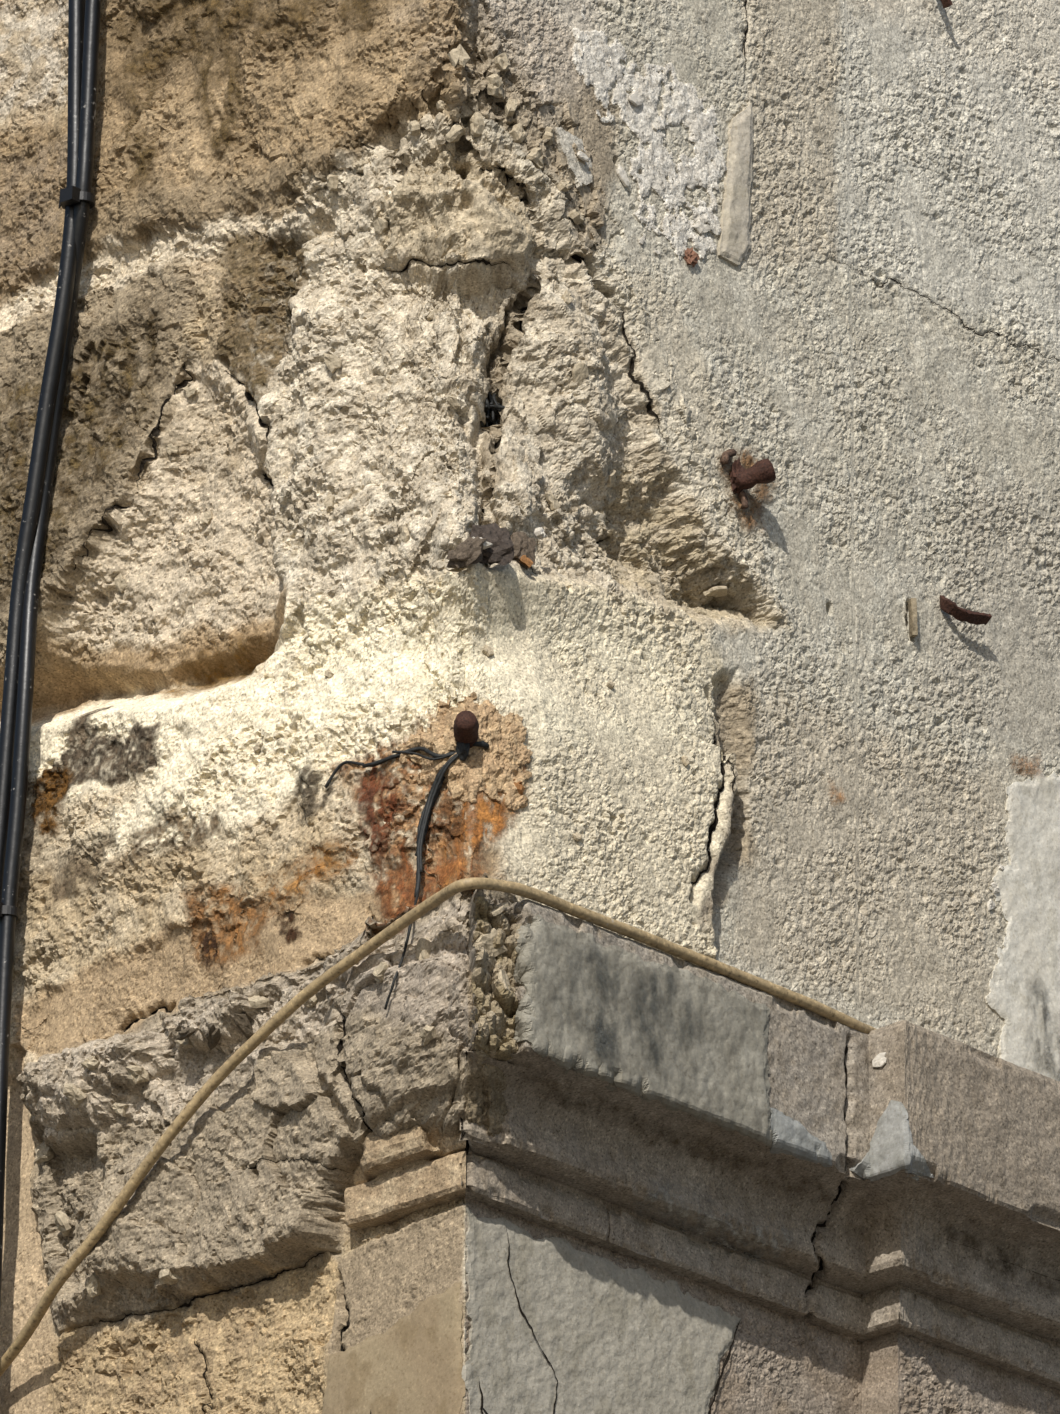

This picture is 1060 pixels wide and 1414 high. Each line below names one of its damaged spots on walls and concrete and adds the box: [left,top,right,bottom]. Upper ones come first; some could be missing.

crack [73,362,193,570]
crack [226,365,269,437]
spalling [31,4,787,723]
crack [613,301,670,448]
rust [720,450,774,528]
rust [940,595,992,625]
rust [185,844,352,967]
rust [338,718,515,935]
crack [689,727,736,899]
peeling [985,768,1060,1081]
spalling [25,896,832,1333]
peeling [850,1100,934,1181]